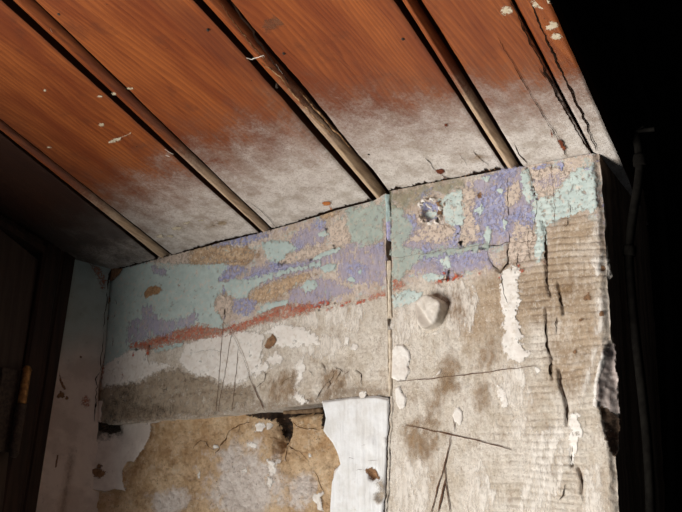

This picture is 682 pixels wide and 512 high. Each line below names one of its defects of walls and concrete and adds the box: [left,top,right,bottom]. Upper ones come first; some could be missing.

crack [497,36,568,157]
crack [510,2,597,151]
crack [94,146,571,512]
peeling [89,162,601,410]
peeling [583,292,605,334]
peeling [591,253,607,276]
leakage [99,368,254,425]
spalling [582,344,620,457]
spalling [92,407,340,512]
peeling [393,456,430,512]
peeling [465,459,496,512]
crack [559,448,583,501]